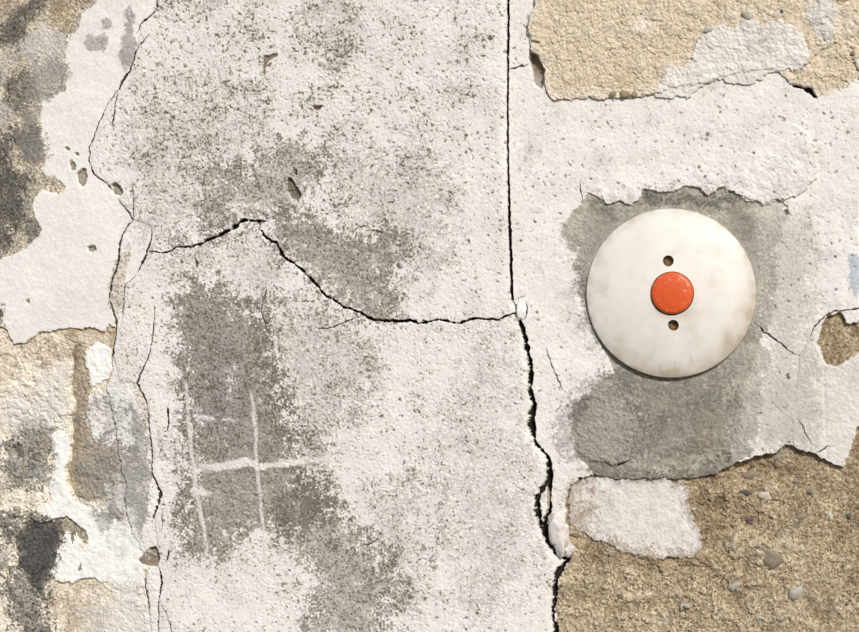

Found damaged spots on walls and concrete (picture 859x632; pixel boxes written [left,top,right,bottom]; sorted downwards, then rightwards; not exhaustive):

water stain [0,0,87,248]
peeling [0,0,97,260]
flaking render [527,0,859,101]
peeling [0,310,160,632]
crack [88,0,570,632]
spalling [555,312,859,632]